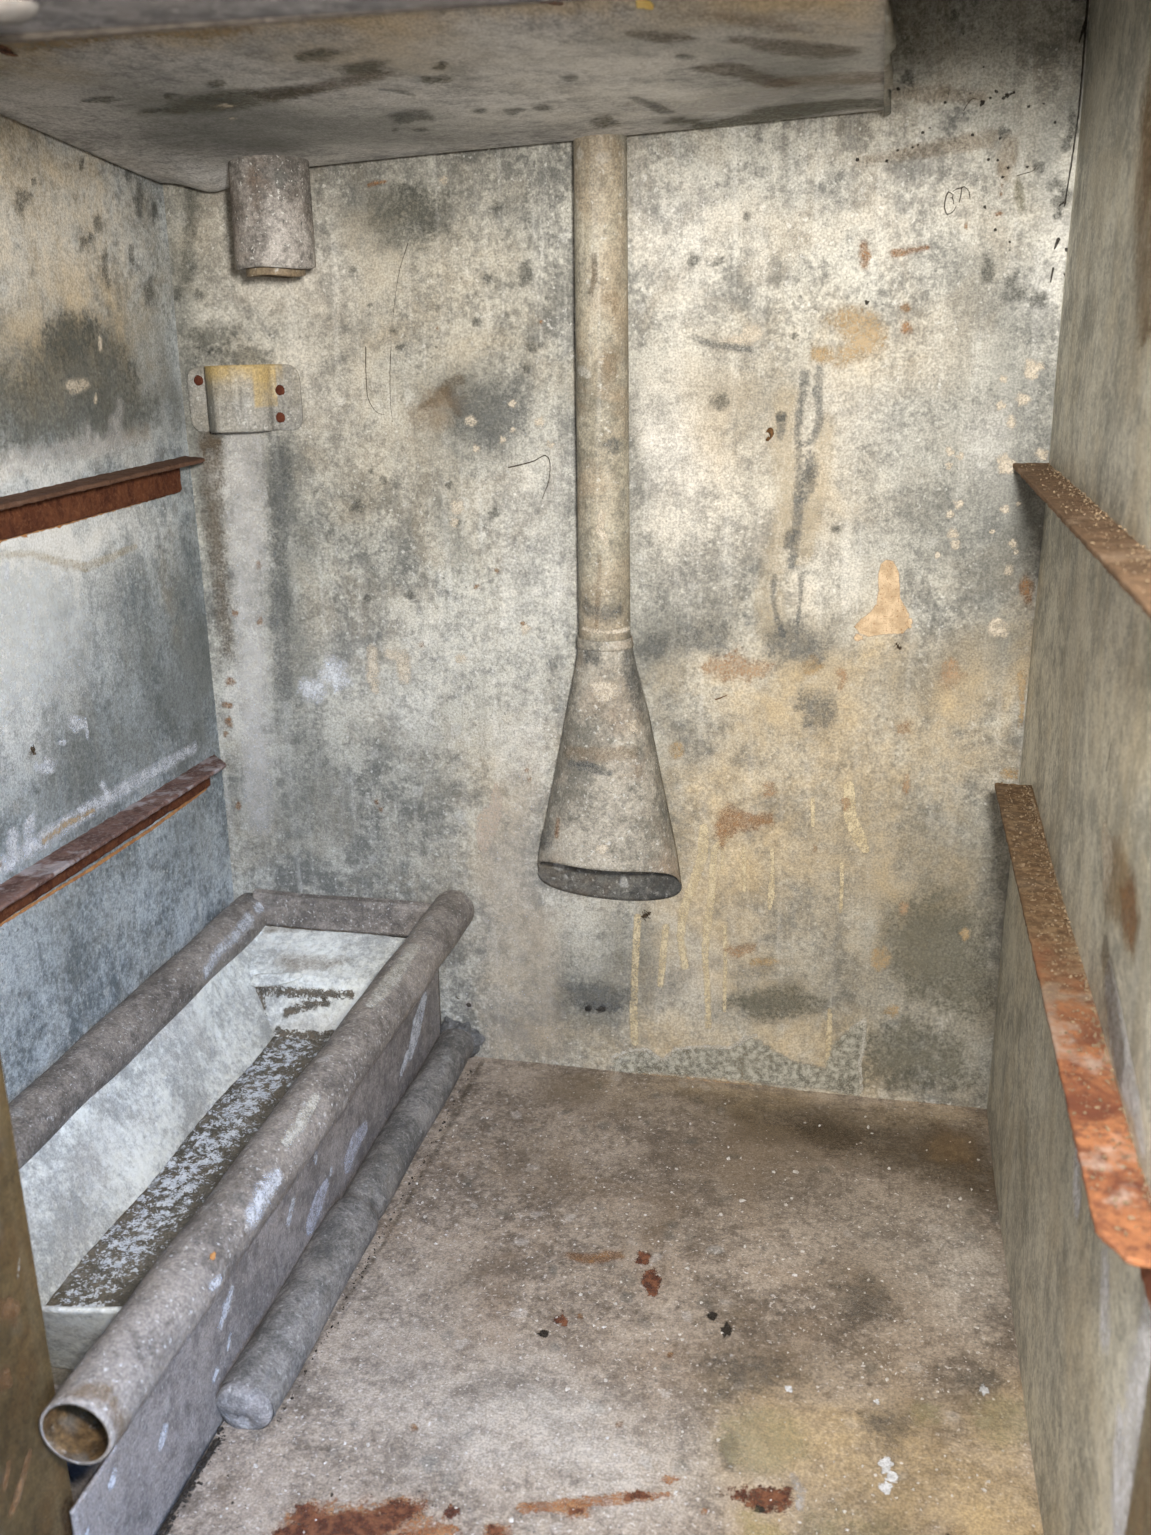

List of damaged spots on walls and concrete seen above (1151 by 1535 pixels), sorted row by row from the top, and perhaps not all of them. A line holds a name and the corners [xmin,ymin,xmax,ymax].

leakage [143,49,405,119]
leakage [0,322,153,449]
leakage [590,636,667,732]
leakage [843,781,869,853]
leakage [567,804,992,1109]
rust [567,1251,662,1297]
rust [537,1310,583,1337]
rust [707,1312,732,1338]
rust [271,1496,462,1535]
rust [484,1475,679,1535]
rust [719,1484,797,1514]